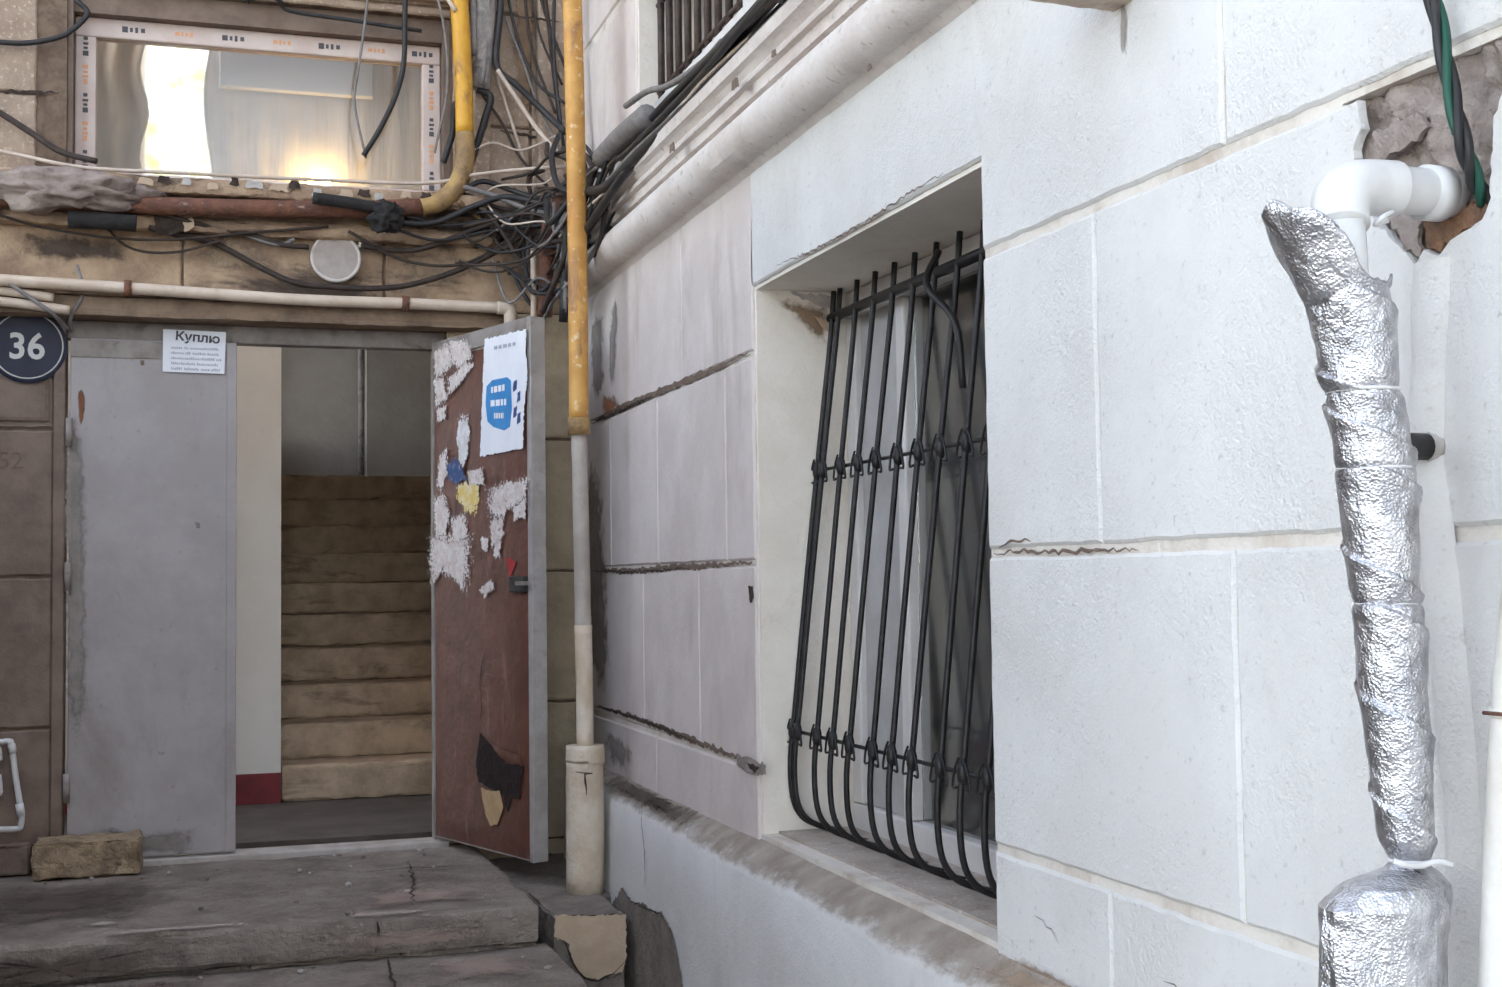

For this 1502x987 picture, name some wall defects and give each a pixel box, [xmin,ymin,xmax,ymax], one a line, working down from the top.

spalling [1362,39,1502,258]
crack [370,861,459,905]
crack [375,921,397,987]
spalling [612,887,683,987]